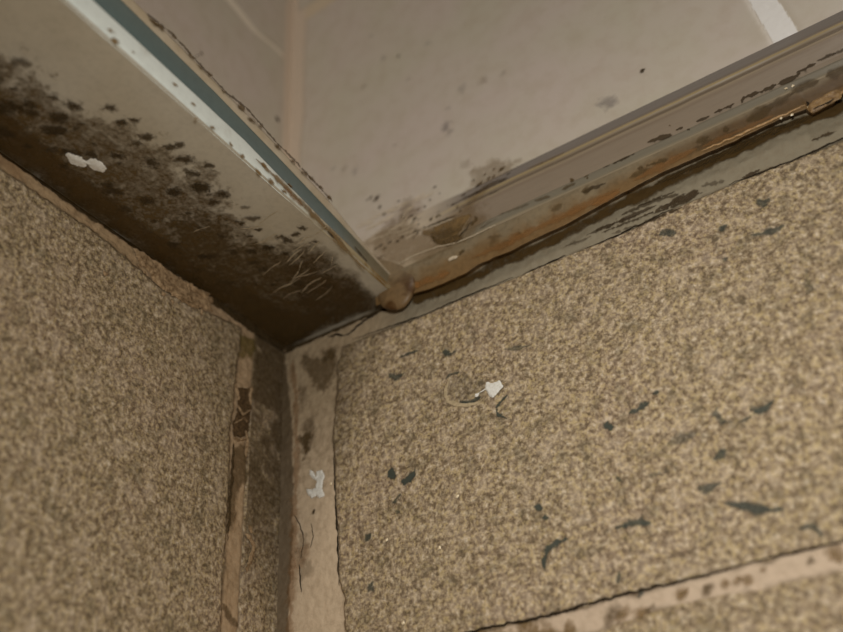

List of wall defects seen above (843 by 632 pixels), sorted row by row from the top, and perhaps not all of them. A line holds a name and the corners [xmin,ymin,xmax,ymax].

water stain [0,59,386,357]
water stain [148,14,332,201]
water stain [413,101,843,304]
water stain [697,49,843,122]
peeling [701,89,843,151]
water stain [300,433,311,453]